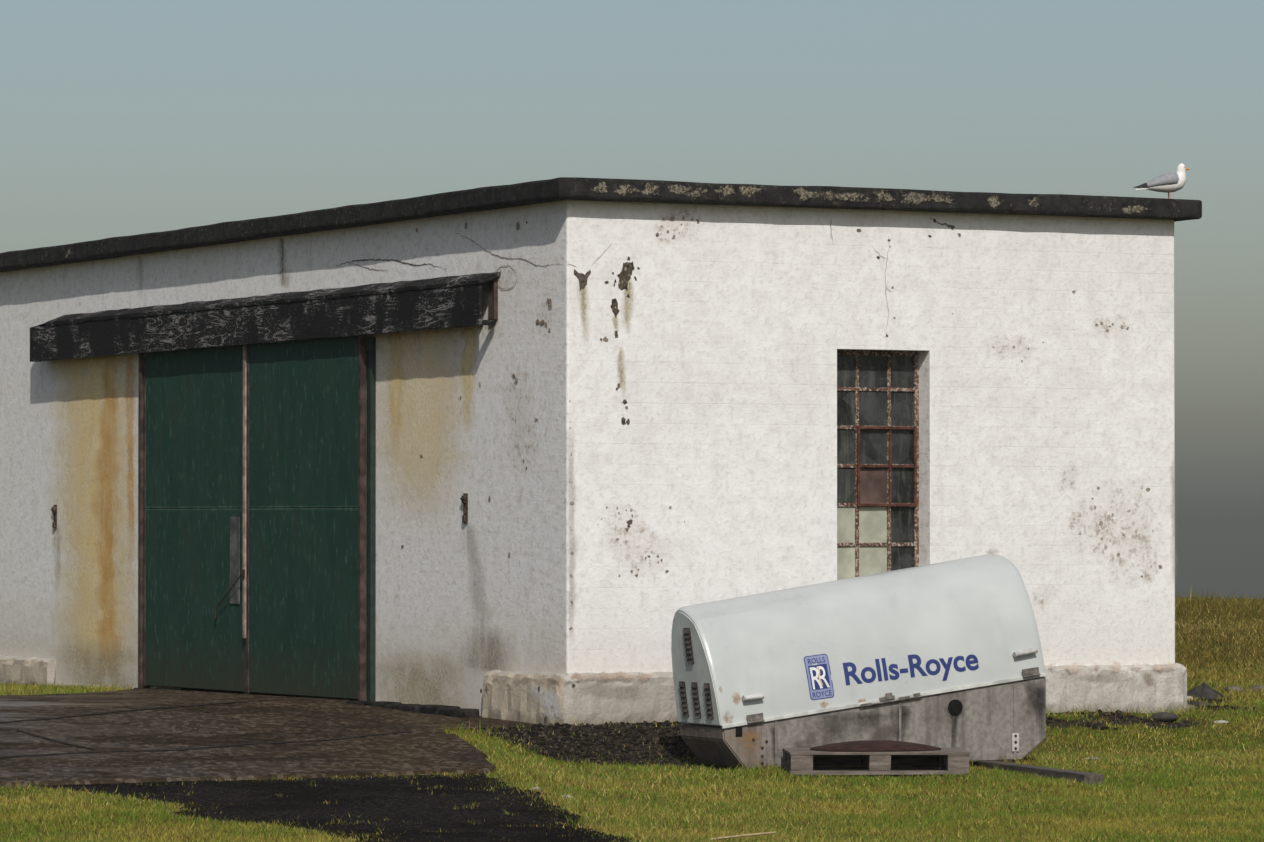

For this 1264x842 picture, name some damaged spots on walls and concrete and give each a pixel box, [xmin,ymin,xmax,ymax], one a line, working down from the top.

crack [336,259,443,271]
crack [456,233,611,267]
corrosion [100,358,133,658]